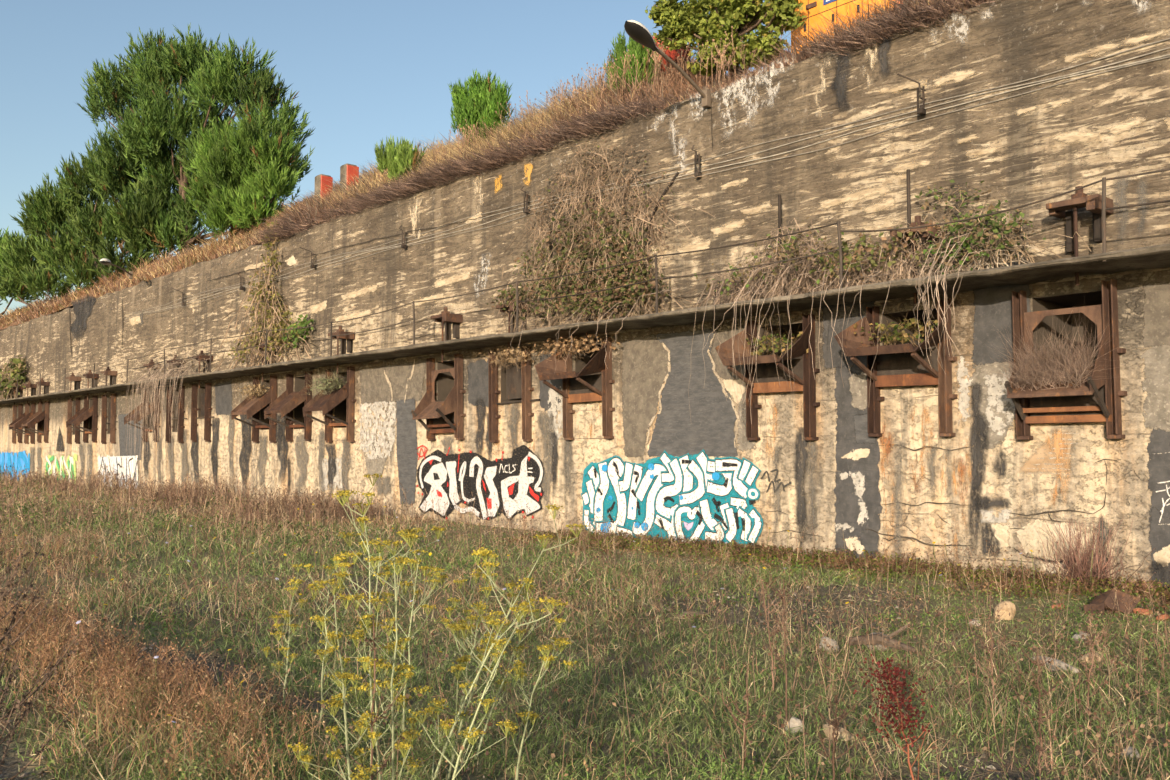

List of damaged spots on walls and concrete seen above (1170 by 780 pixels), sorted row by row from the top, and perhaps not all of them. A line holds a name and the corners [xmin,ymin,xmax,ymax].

peeling [821,301,883,561]
water stain [969,384,1008,556]
spalling [1140,282,1170,588]